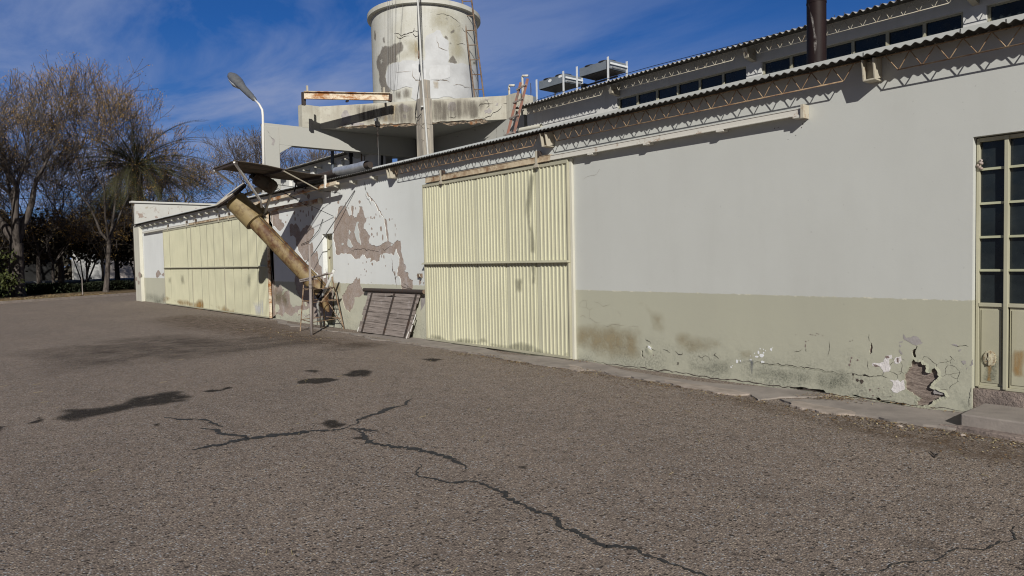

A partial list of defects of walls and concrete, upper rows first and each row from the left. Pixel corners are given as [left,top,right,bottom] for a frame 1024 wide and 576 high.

damp [434,102,482,119]
peeling [270,192,425,339]
crack [755,340,971,398]
spalling [849,334,949,408]